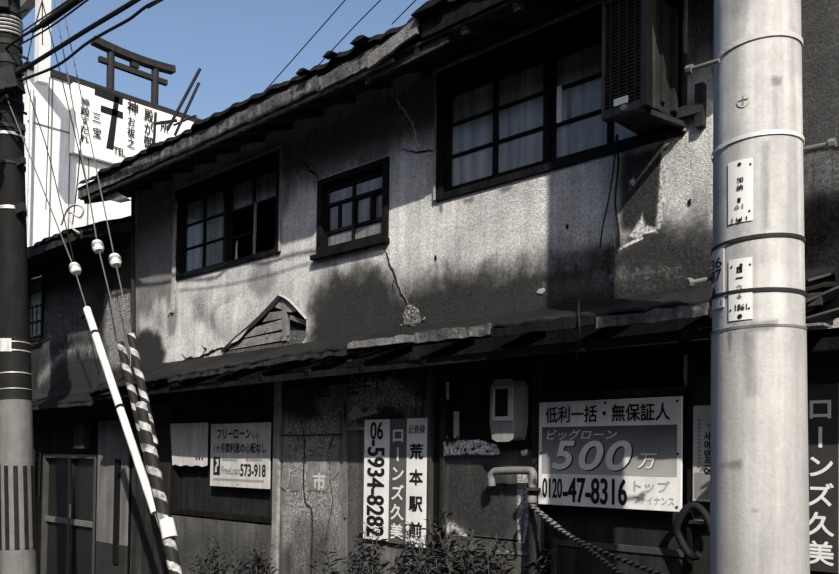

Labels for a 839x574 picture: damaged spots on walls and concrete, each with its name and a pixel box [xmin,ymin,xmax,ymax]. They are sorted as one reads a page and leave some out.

crack [397,99,432,153]
water stain [307,141,713,342]
water stain [804,191,839,270]
crack [384,248,408,306]
spalling [400,305,425,326]
water stain [364,338,462,351]
peeling [444,440,500,455]